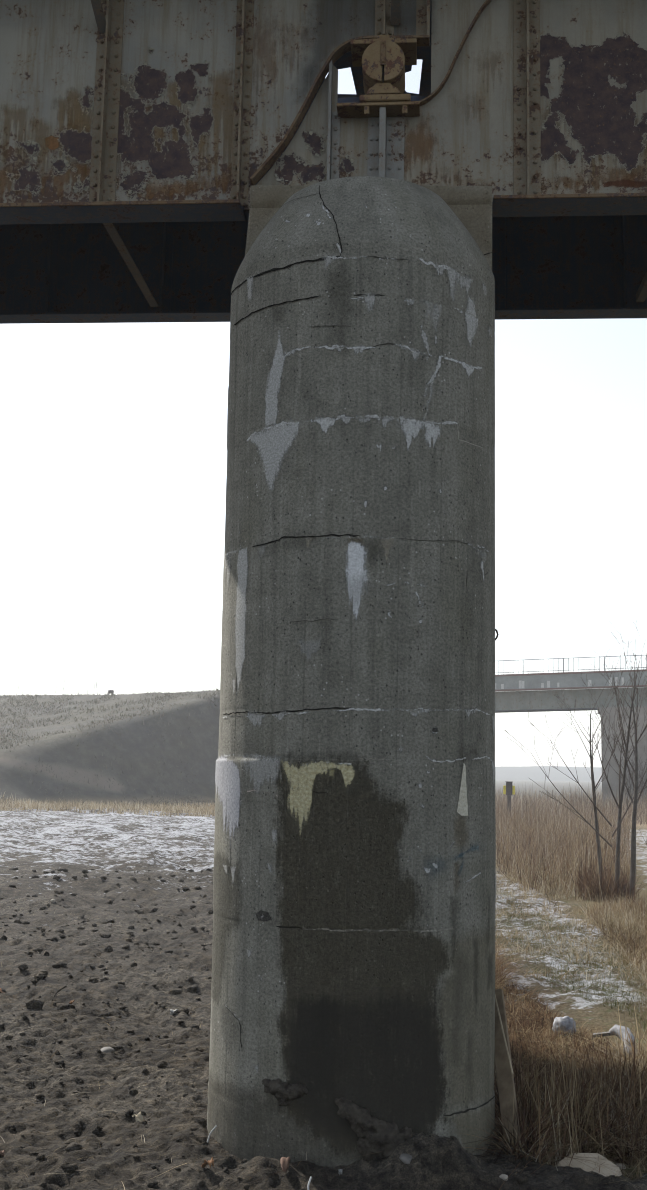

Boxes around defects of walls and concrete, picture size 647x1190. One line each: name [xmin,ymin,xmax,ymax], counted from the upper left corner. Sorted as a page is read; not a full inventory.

rust [541,166,647,190]
crack [231,186,407,350]
crack [252,534,359,547]
crack [223,707,349,715]
leakage [207,754,449,1166]